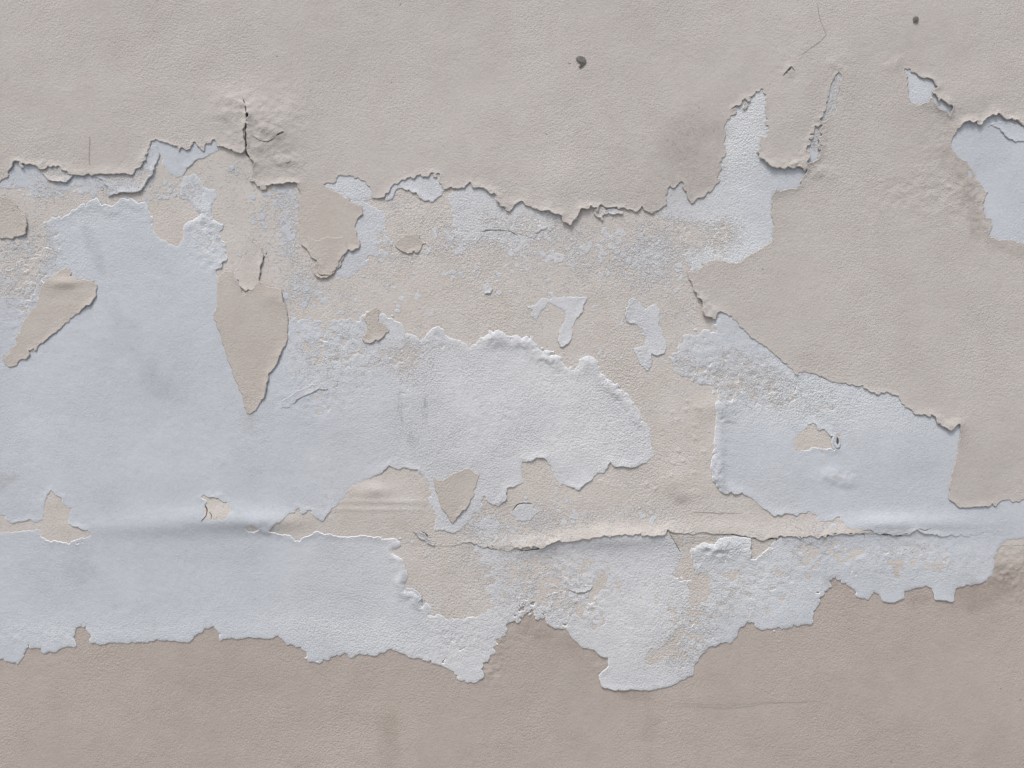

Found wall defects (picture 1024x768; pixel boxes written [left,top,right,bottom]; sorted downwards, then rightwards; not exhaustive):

crack [243,99,284,157]
peeling [806,73,842,155]
peeling [0,89,1024,691]